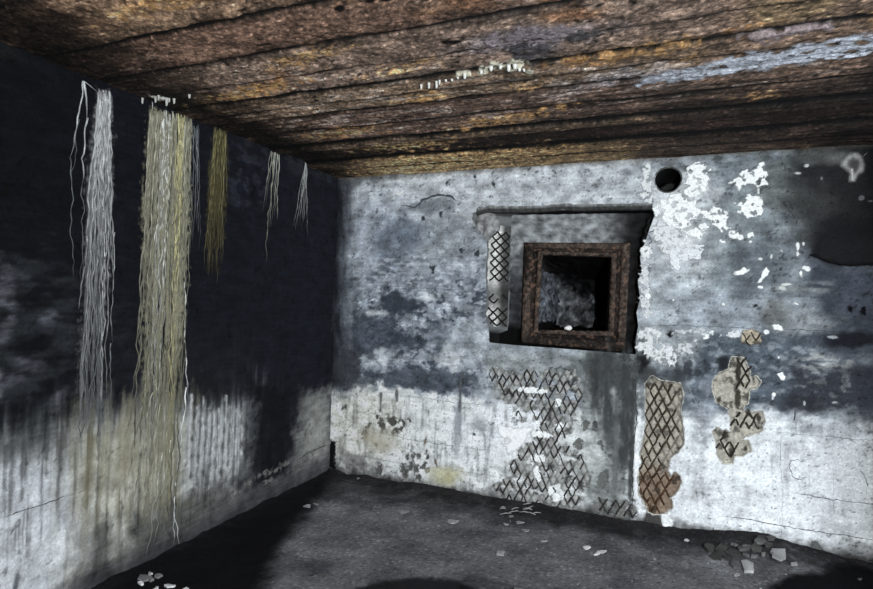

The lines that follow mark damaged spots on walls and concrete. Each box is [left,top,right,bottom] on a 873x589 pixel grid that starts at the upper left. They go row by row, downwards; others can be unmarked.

water stain [69,81,115,451]
water stain [91,102,330,589]
spalling [488,367,685,527]
peeling [635,162,783,367]
spalling [711,356,766,465]